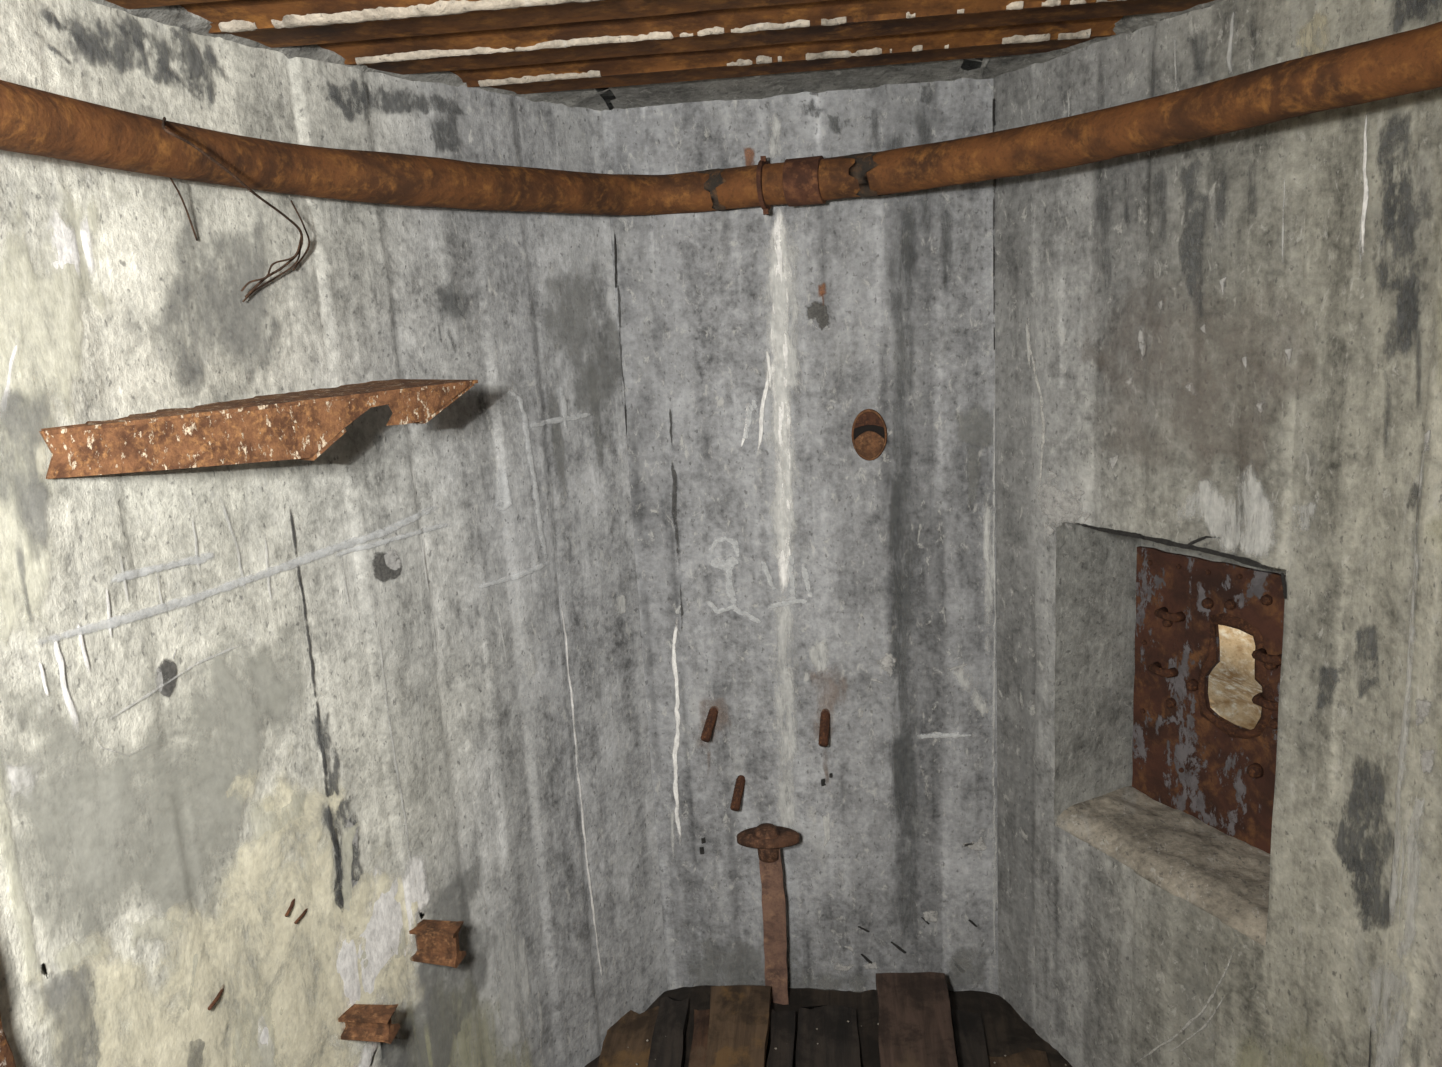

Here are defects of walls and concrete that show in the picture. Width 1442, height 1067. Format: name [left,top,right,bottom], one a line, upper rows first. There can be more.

water stain [1376,117,1429,403]
crack [290,511,364,931]
water stain [1317,667,1343,709]
water stain [1356,626,1378,697]
water stain [1332,765,1392,928]